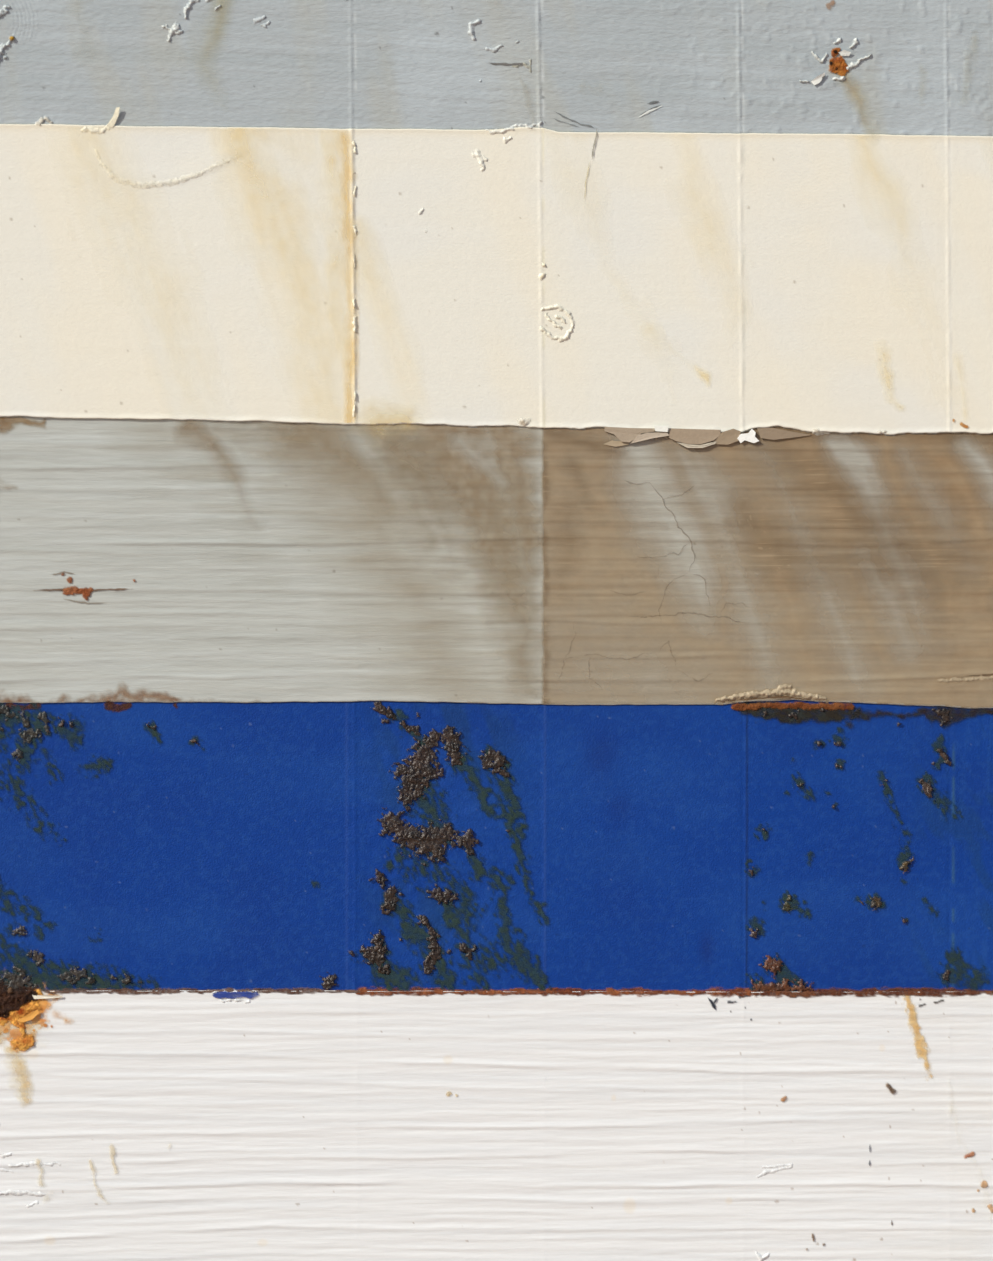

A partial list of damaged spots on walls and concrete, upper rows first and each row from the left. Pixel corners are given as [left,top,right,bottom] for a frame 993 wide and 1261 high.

corrosion [799,37,872,85]
corrosion [0,417,45,432]
damp [279,423,363,470]
peeling [604,426,831,448]
corrosion [36,571,135,604]
damp [373,425,993,708]
corrosion [60,688,179,712]
corrosion [0,698,993,1076]